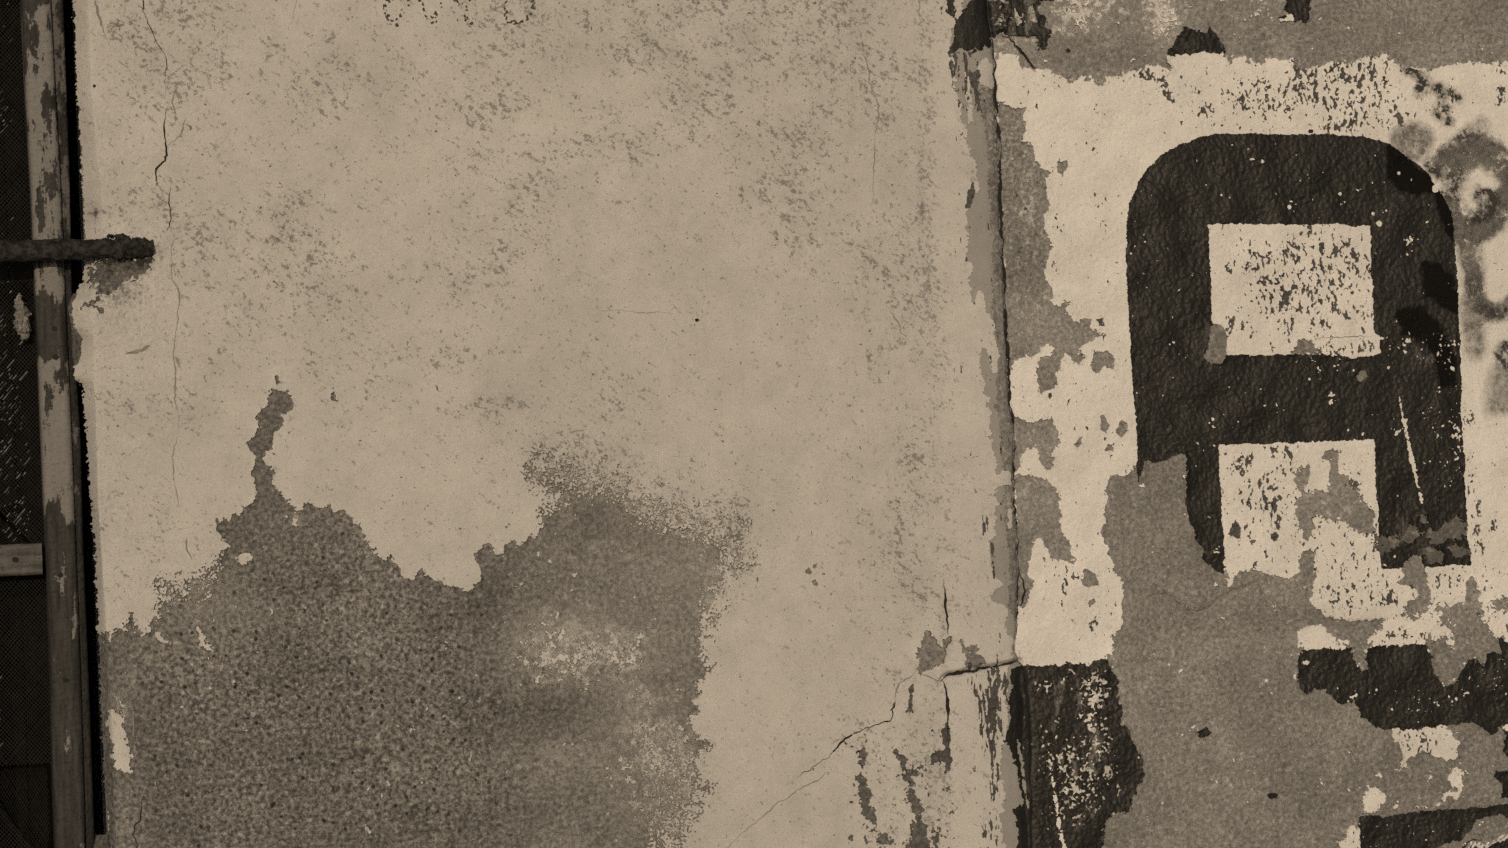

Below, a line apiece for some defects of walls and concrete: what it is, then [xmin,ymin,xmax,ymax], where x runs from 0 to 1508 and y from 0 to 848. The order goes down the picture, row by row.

crack [94,0,107,38]
crack [126,0,186,503]
flaking render [98,375,760,848]
crack [728,7,1036,848]
flaking render [844,723,953,848]
flaking render [905,630,985,713]
peeling [979,0,1508,848]